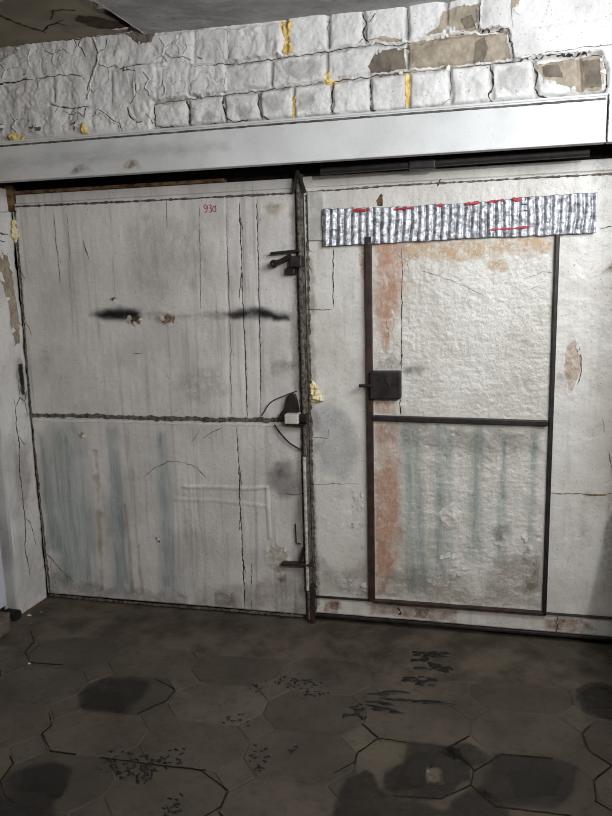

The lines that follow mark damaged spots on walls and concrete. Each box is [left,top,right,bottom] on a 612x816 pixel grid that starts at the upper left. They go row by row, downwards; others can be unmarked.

flaking render [368,3,513,77]
crack [0,4,612,139]
flaking render [537,56,608,94]
crack [25,631,63,665]
crack [137,678,175,714]
leakage [577,683,612,719]
crack [41,714,76,755]
crack [100,757,229,816]
leakage [334,742,577,816]